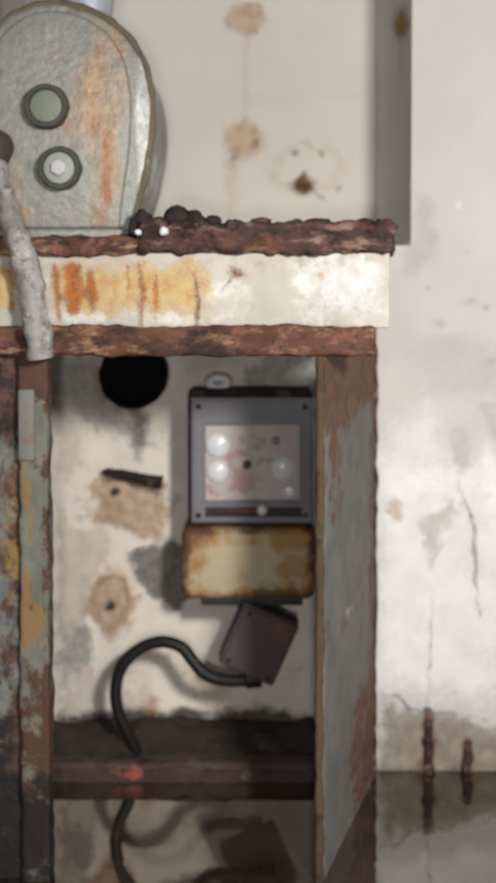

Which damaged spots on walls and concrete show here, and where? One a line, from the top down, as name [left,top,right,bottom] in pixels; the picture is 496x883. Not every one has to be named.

corrosion [261,137,348,202]
corrosion [0,261,20,316]
corrosion [47,255,248,327]
crack [453,480,482,614]